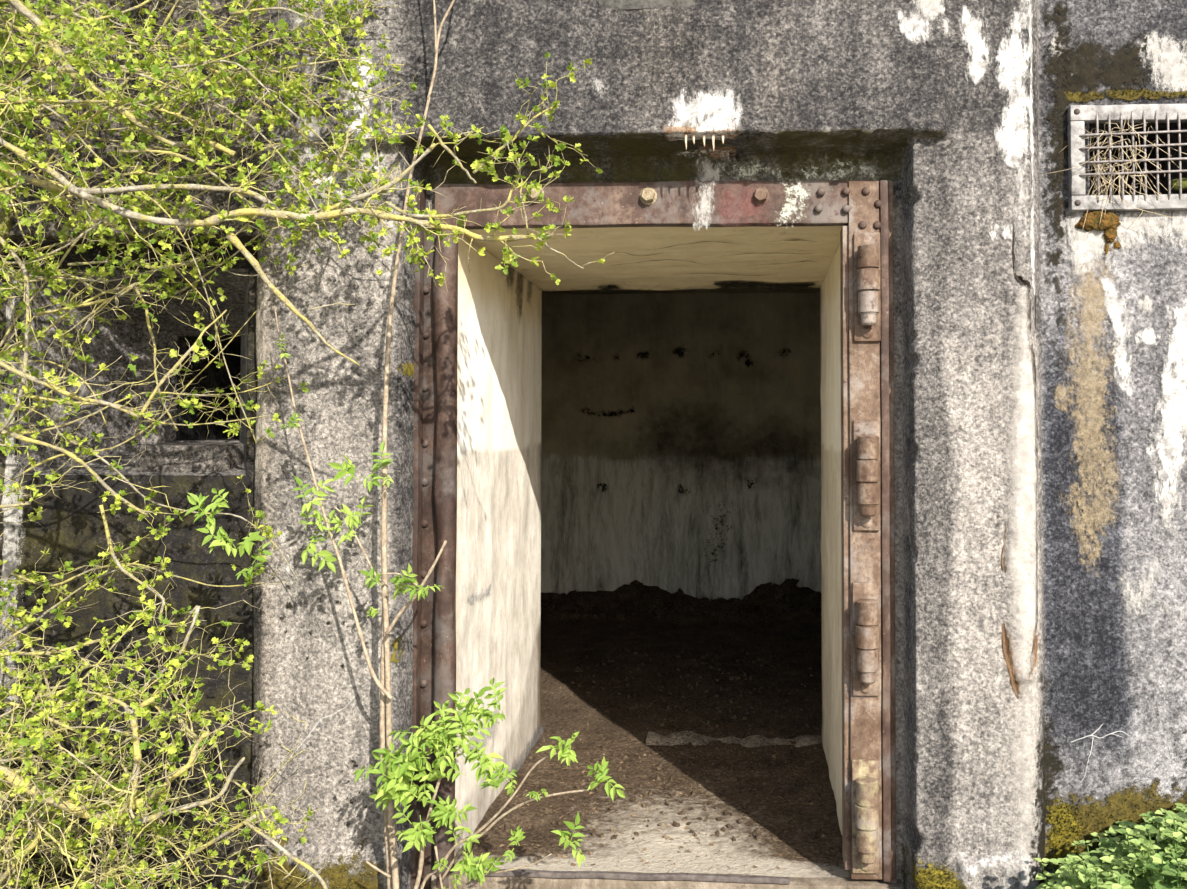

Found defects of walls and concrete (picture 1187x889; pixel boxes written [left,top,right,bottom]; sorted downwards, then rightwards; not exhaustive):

peeling [898,0,950,43]
leakage [665,88,781,228]
leakage [802,159,879,181]
leakage [961,0,1187,394]
crack [1002,228,1038,699]
leakage [1101,278,1187,533]
crack [1000,525,1008,573]